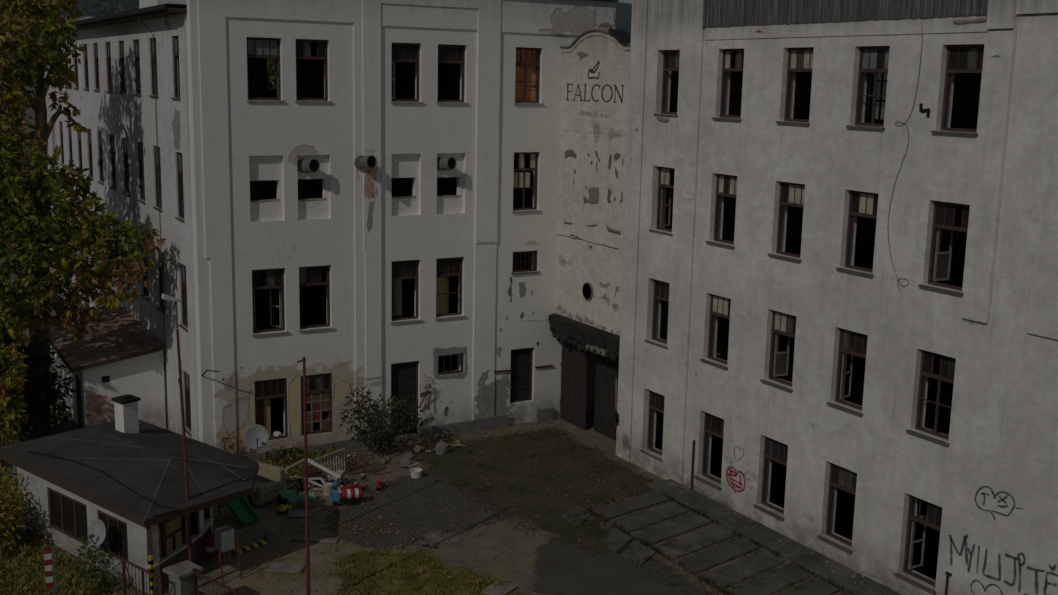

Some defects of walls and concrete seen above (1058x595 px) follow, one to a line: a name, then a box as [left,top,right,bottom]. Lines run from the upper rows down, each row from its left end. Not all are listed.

flaking render [364,168,378,198]
flaking render [565,149,623,204]
flaking render [85,390,115,426]
flaking render [222,383,255,433]
flaking render [272,375,313,450]
flaking render [333,376,382,406]
flaking render [474,370,515,419]